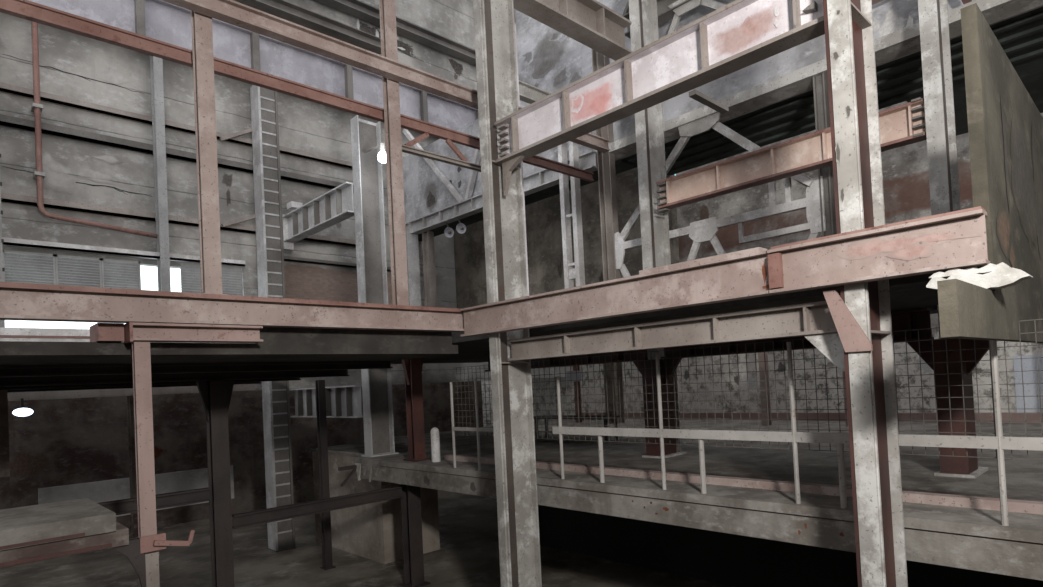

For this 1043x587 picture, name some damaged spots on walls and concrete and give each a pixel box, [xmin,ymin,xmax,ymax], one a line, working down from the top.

corrosion [708,0,790,64]
crack [3,54,144,94]
crack [76,182,152,197]